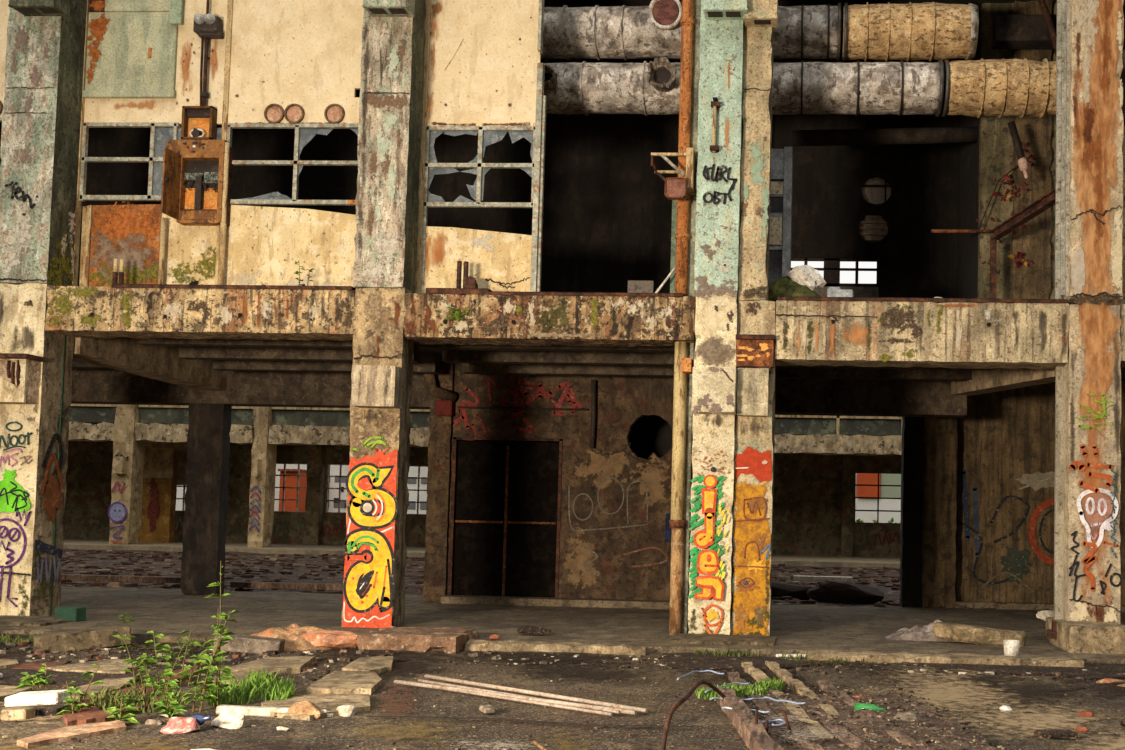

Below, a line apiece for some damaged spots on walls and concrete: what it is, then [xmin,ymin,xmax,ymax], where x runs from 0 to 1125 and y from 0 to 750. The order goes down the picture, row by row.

corrosion [86,0,110,84]
peeling [386,39,405,79]
peeling [361,91,407,236]
corrosion [91,202,160,245]
peeling [700,226,728,260]
crack [1071,205,1123,224]
corrosion [1073,0,1122,508]
spalling [186,300,210,323]
leakage [803,318,826,356]
leakage [946,309,962,357]
leakage [1061,314,1076,369]
corrosion [1083,525,1110,599]